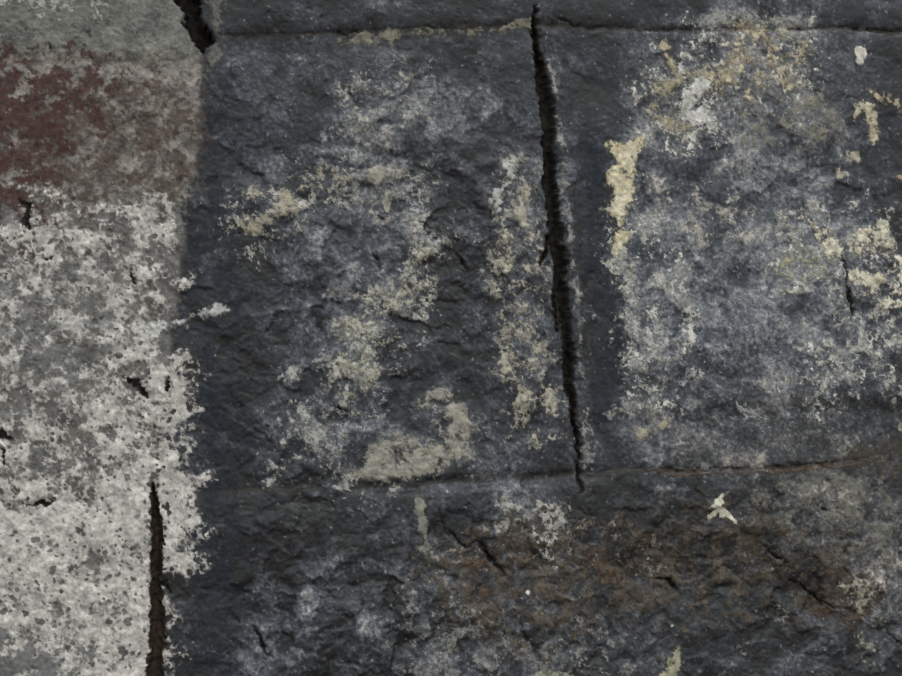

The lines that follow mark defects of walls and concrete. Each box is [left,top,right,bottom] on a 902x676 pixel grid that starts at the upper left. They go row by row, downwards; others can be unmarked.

crack [529,6,584,493]
crack [146,482,171,676]